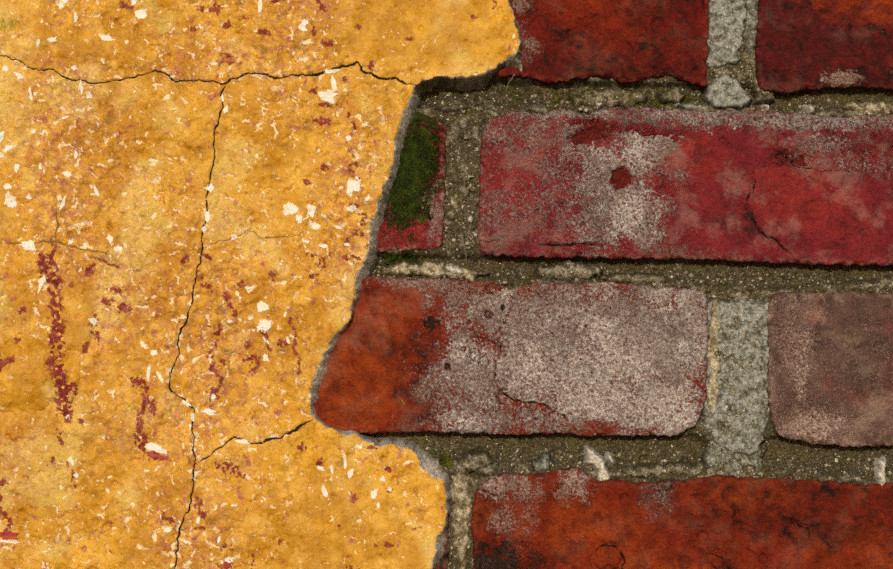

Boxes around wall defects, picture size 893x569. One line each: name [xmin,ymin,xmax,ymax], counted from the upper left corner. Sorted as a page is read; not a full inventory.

spalling [568,117,616,147]
spalling [610,164,633,191]
peeling [283,202,321,230]
damp [422,184,443,246]
spalling [310,0,523,569]
crack [0,55,406,569]
peeling [583,445,616,481]